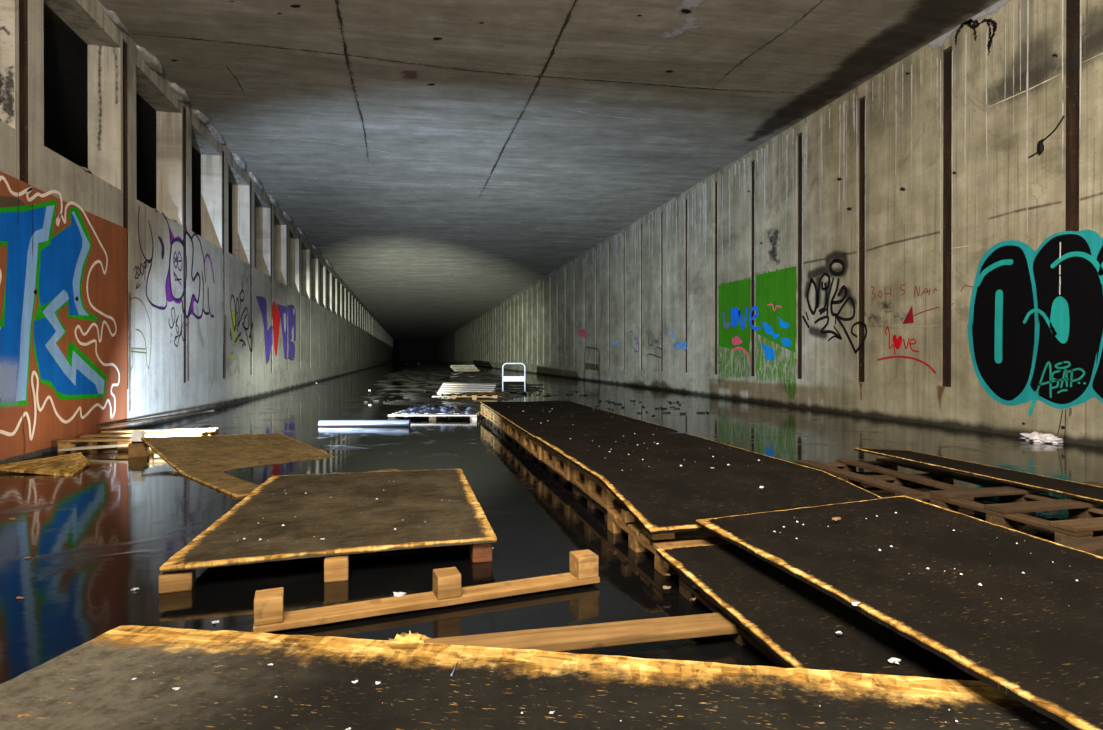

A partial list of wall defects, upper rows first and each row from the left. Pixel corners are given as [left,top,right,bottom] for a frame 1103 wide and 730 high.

water stain [0,67,14,123]
crack [97,0,823,196]
water stain [614,0,988,301]
water stain [1005,0,1029,229]